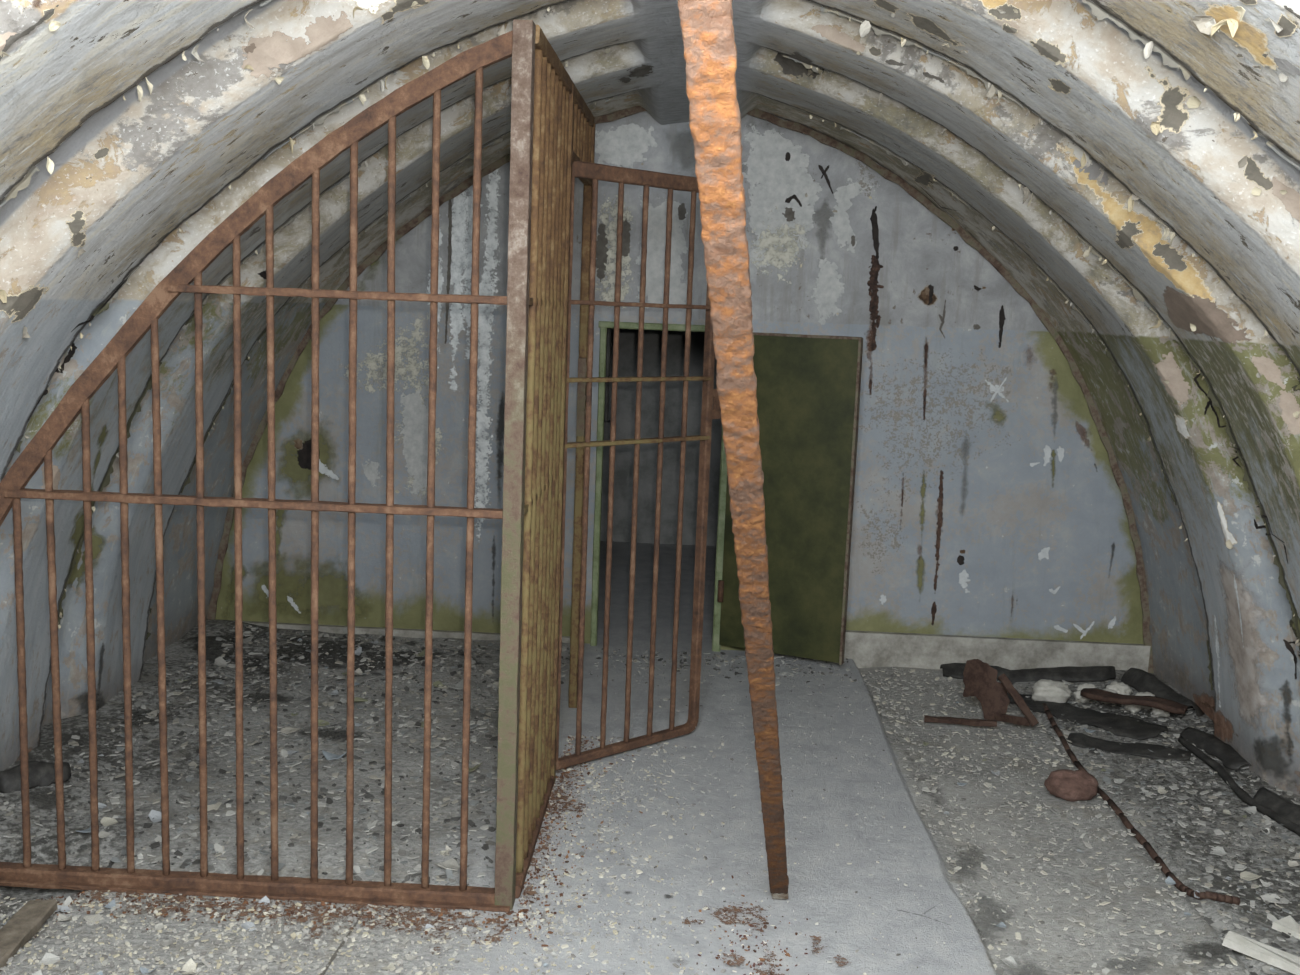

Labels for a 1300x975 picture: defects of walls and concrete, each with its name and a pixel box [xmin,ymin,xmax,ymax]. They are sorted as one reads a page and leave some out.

peeling [0,32,17,57]
peeling [123,77,153,102]
peeling [182,44,205,62]
peeling [241,0,432,84]
peeling [978,0,1072,95]
peeling [1082,0,1207,135]
peeling [1193,0,1300,82]
peeling [0,157,54,208]
peeling [89,147,109,164]
peeling [66,210,88,258]
peeling [0,284,49,338]
peeling [92,362,162,514]